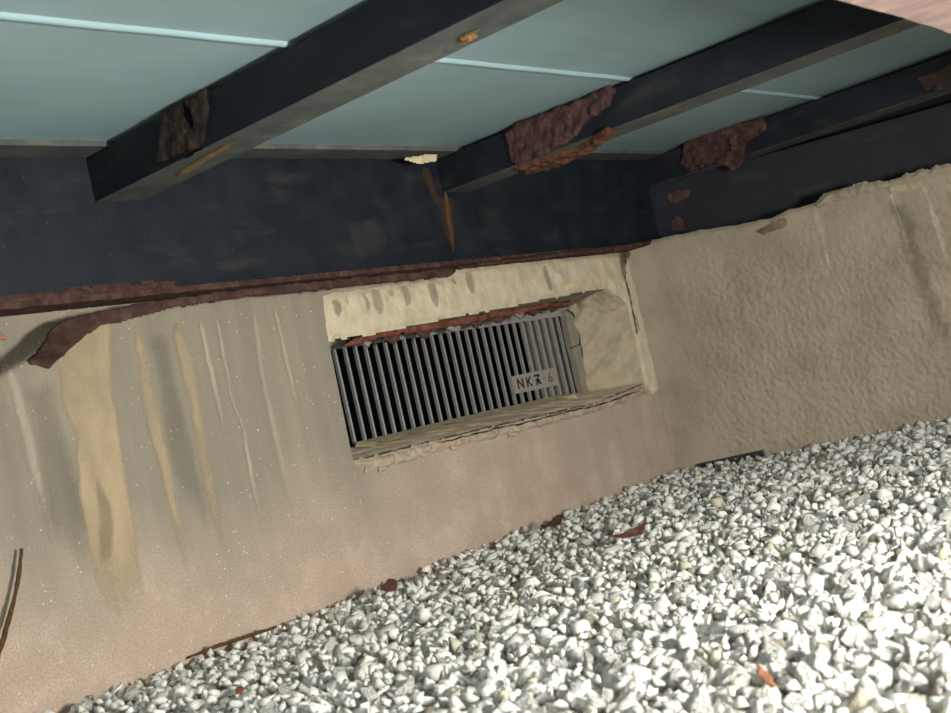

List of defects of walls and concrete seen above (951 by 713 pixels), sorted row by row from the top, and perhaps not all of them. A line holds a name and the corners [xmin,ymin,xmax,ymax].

rust [155,89,233,176]
rust [504,86,617,175]
rust [680,116,767,171]
rust [423,169,453,242]
rust [0,240,652,369]
spalling [343,300,571,347]
damp [57,324,140,591]
damp [136,337,181,539]